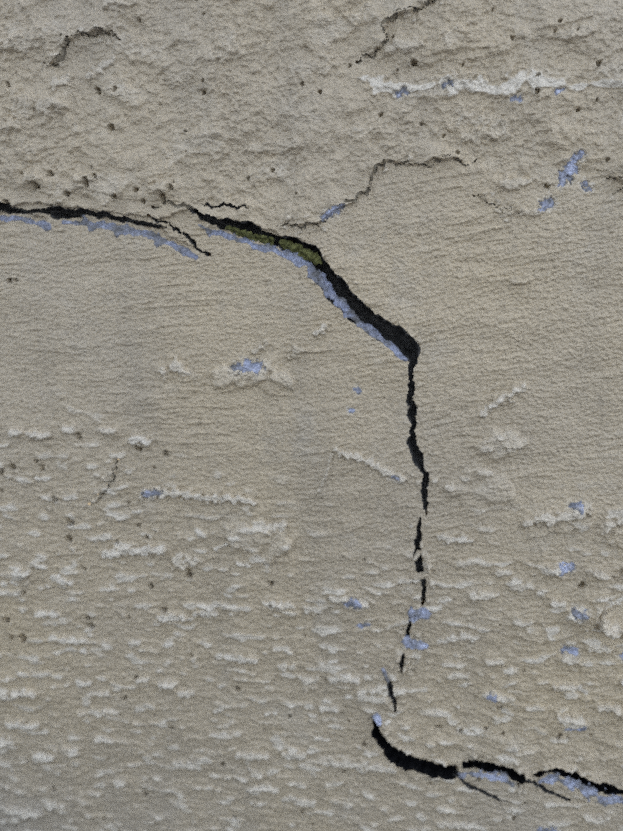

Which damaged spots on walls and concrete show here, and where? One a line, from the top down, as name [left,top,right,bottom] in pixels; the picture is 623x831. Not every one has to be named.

crack [339,154,477,209]
crack [0,200,623,807]